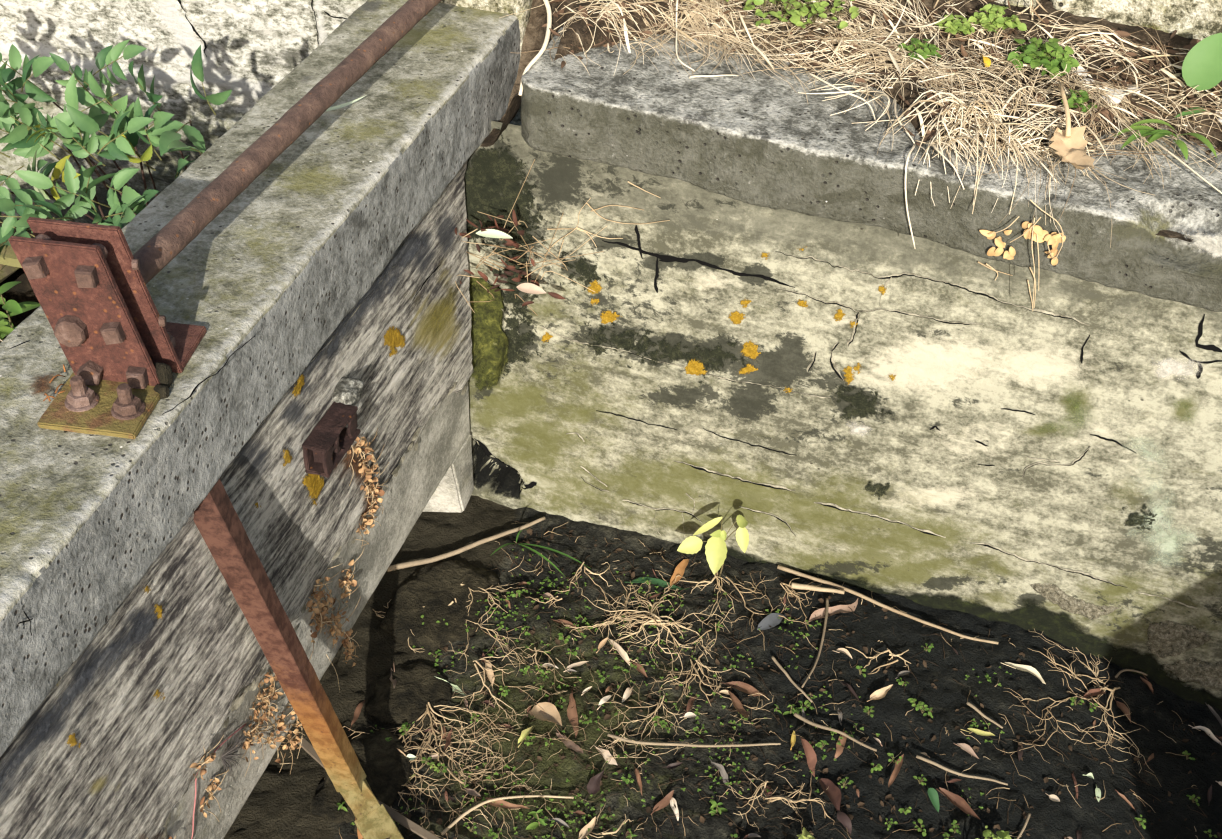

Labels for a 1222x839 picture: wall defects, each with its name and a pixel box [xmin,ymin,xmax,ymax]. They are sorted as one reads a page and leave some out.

crack [177,0,207,57]
crack [541,225,1090,398]
rust [31,364,71,402]
damp [575,317,745,384]
crack [1180,314,1222,379]